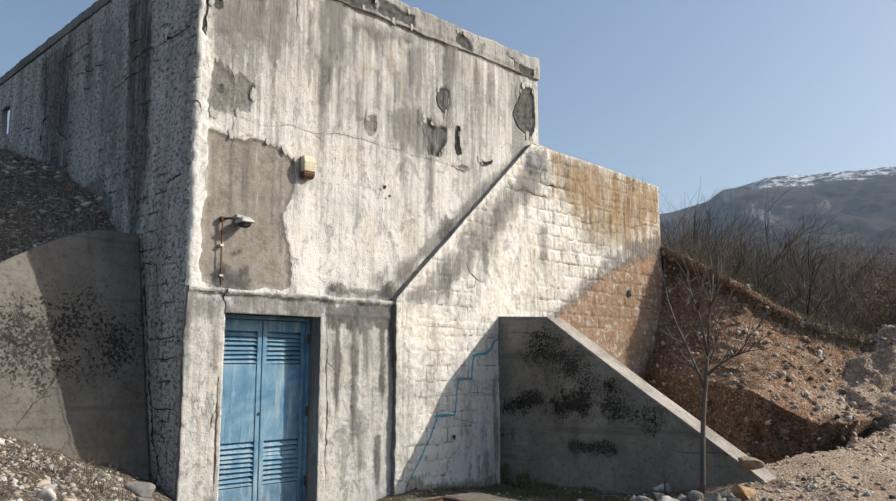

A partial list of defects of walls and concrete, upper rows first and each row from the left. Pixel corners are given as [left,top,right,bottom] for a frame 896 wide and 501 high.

spalling [208,56,257,119]
leakage [312,0,422,123]
spalling [365,110,378,136]
spalling [418,86,493,171]
spalling [456,29,473,51]
spalling [513,64,536,140]
flaking render [198,128,300,291]
leakage [0,286,145,398]
crack [142,236,320,492]
leakage [214,150,548,469]
leakage [494,327,662,444]
leakage [547,237,661,318]